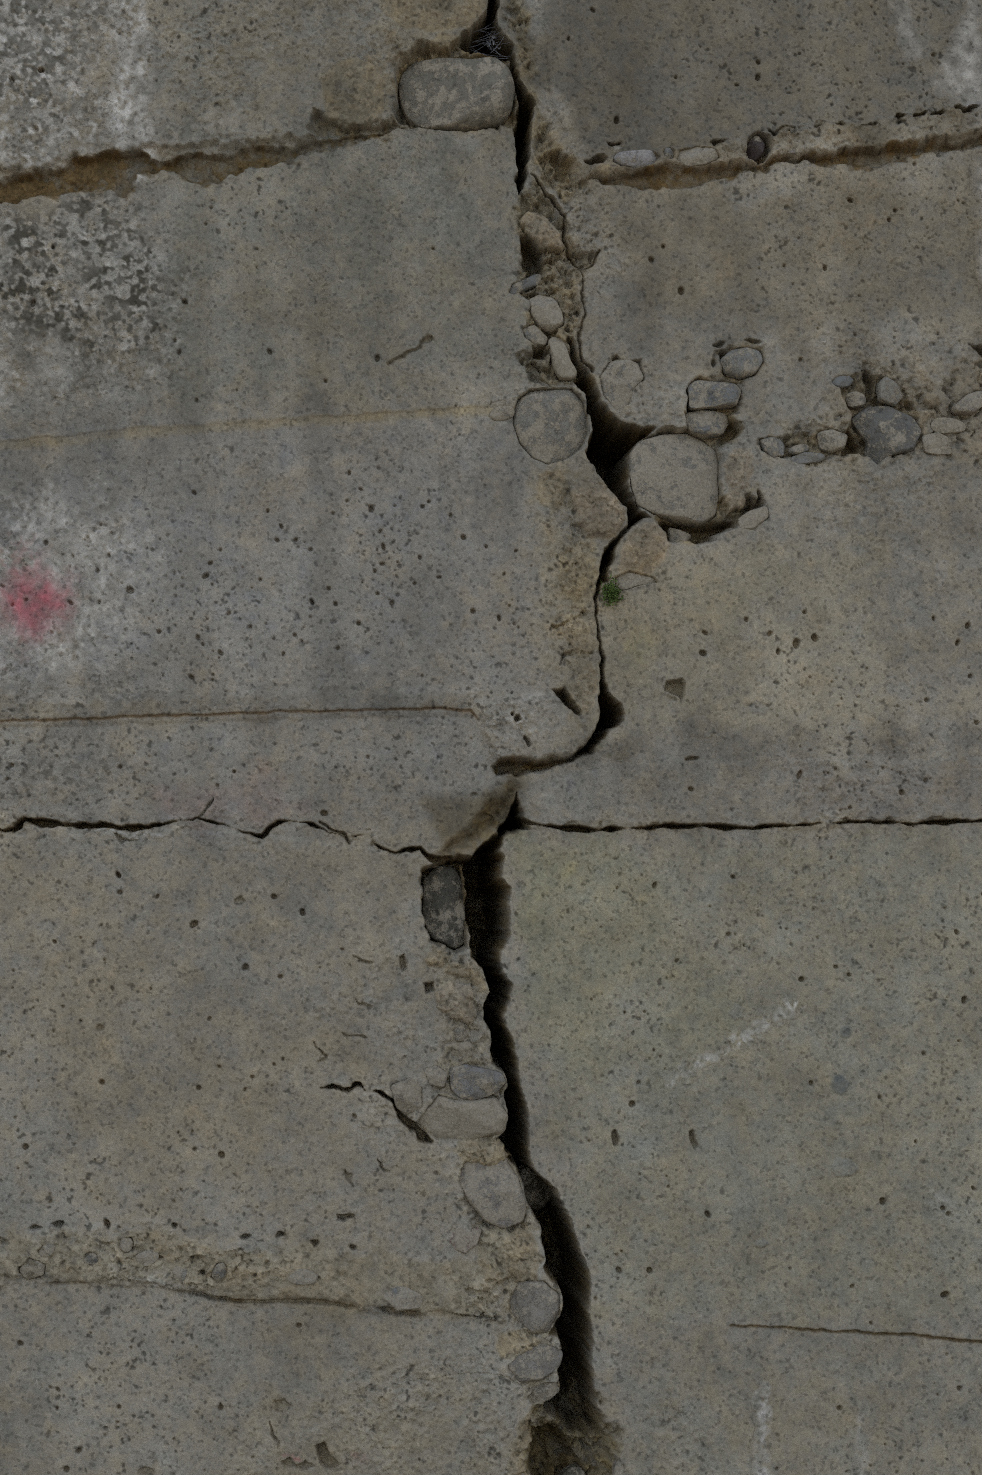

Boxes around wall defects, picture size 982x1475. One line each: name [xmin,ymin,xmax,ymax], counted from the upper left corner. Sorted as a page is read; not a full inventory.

spalling [522,390,610,751]
crack [190,0,982,1422]
crack [0,817,181,846]
spalling [398,927,541,1257]
spalling [494,1275,563,1350]
spalling [269,1398,342,1472]
spalling [398,1343,634,1475]